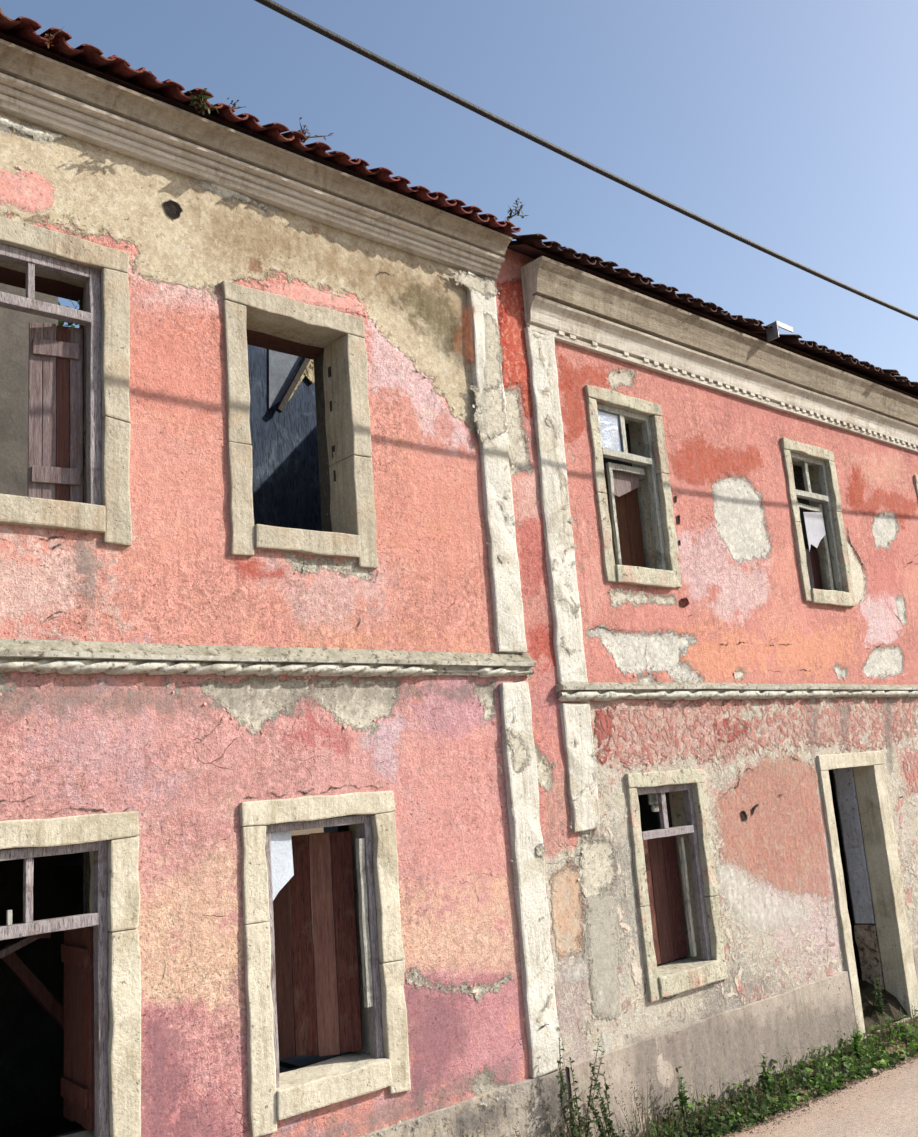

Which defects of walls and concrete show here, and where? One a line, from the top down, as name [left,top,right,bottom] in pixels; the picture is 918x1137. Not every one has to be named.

flaking render [0,112,578,535]
flaking render [711,474,772,563]
flaking render [872,511,901,549]
peeling [550,543,585,618]
flaking render [608,586,690,608]
flaking render [845,531,868,607]
flaking render [895,595,908,625]
flaking render [560,624,705,683]
flaking render [832,644,904,682]
flaking render [167,675,402,736]
flaking render [472,679,556,792]
peeling [523,696,918,1039]